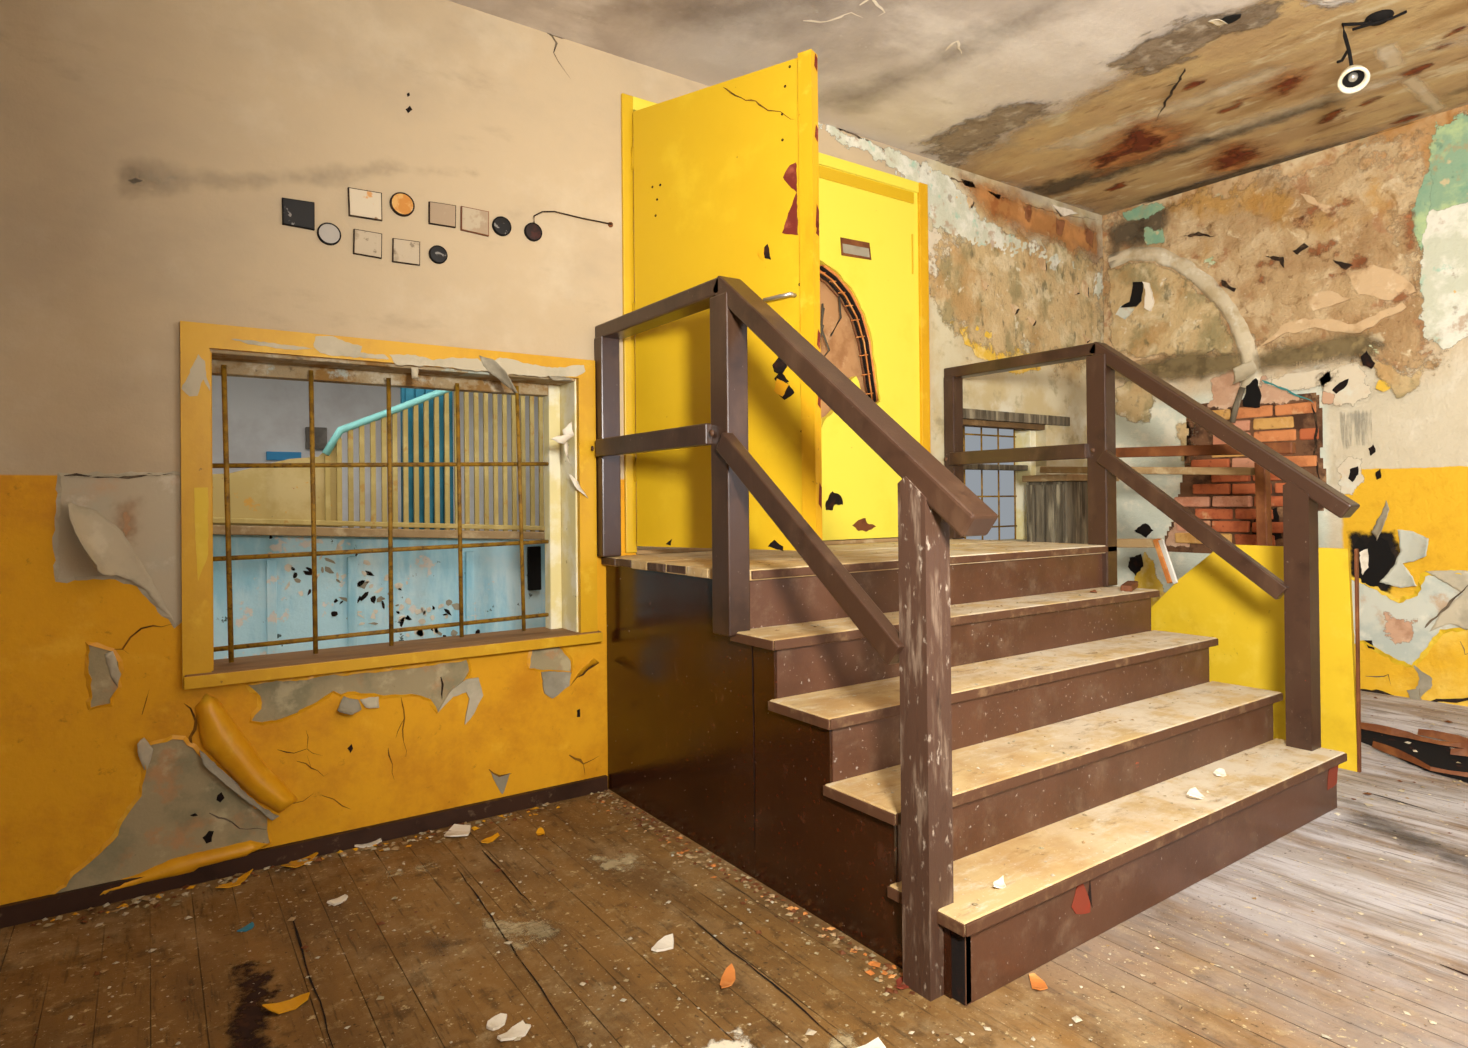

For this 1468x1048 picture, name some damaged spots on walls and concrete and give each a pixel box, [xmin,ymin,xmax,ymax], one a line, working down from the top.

rust [1267,69,1306,95]
rust [1320,96,1382,124]
rust [1402,26,1466,76]
rust [1086,118,1188,191]
rust [1204,143,1266,172]
flaking render [928,129,1441,495]
flaking render [1128,418,1286,575]
flaking render [52,471,209,628]
flaking render [1351,501,1468,697]
flaking render [245,658,483,726]
crack [277,731,349,809]
crack [388,698,407,778]